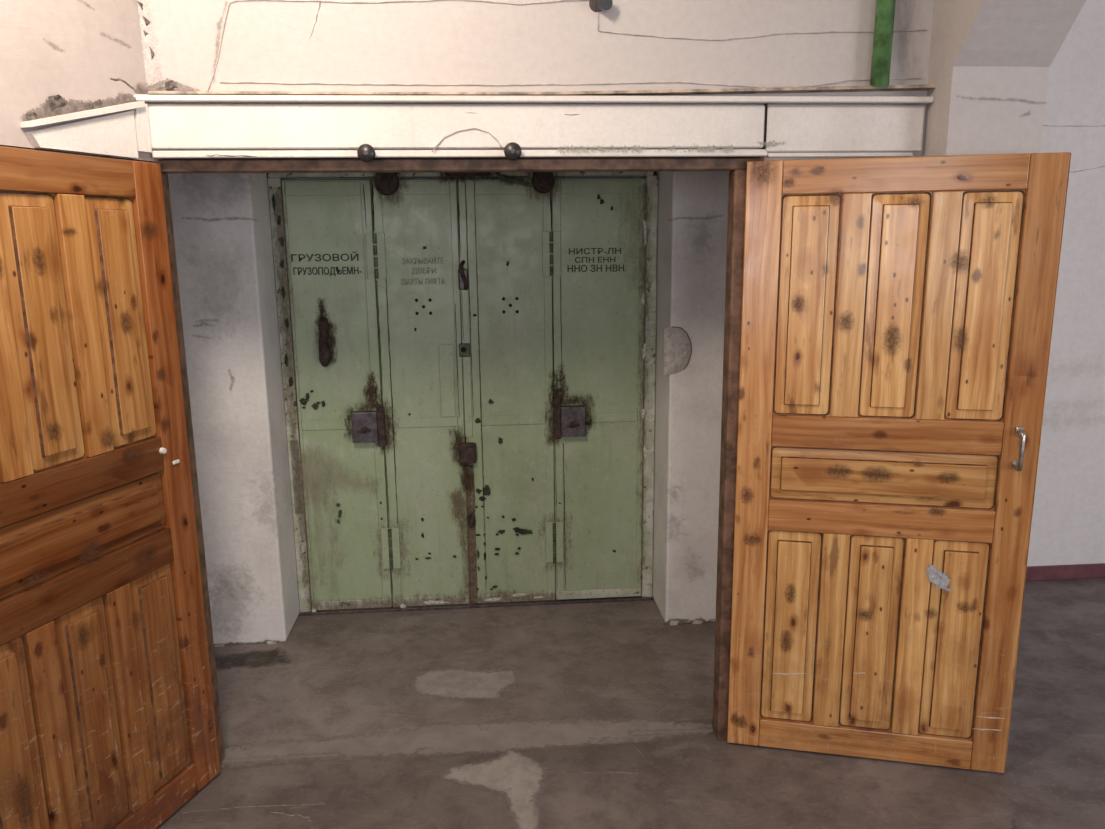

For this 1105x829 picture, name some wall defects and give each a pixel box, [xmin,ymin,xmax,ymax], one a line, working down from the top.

crack [110,78,136,93]
corrosion [316,300,337,368]
corrosion [345,281,398,526]
corrosion [440,172,524,462]
corrosion [545,276,592,465]